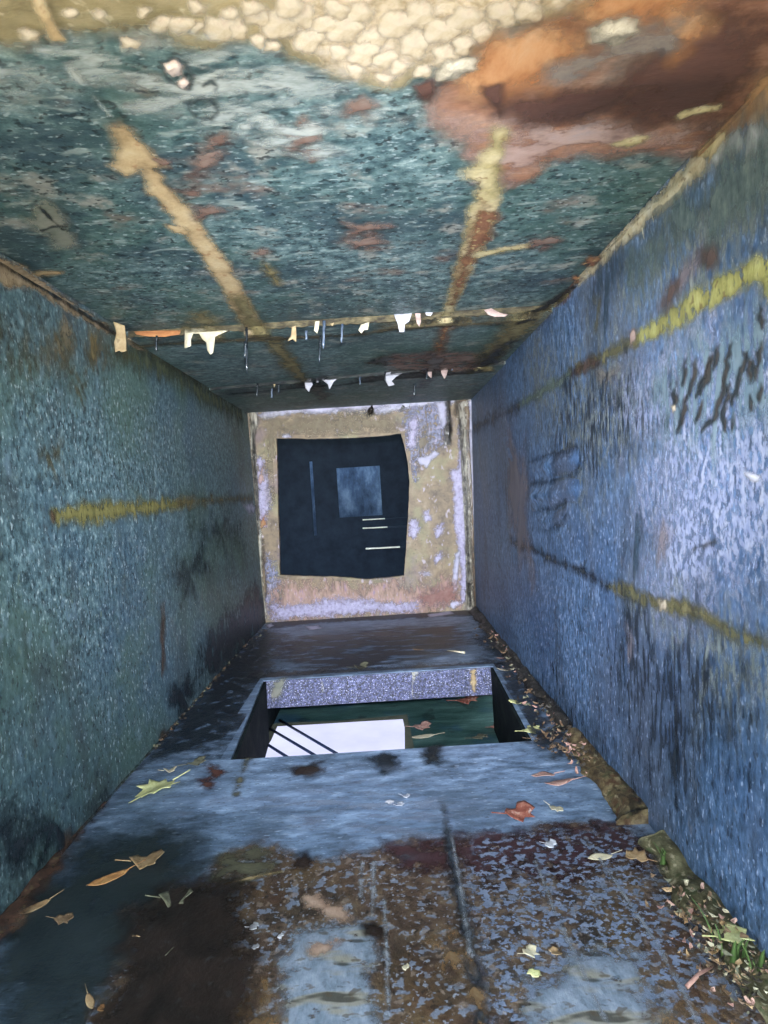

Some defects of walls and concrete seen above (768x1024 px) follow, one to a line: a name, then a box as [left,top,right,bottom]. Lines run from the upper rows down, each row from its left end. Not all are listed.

peeling [0,0,595,89]
rust [414,0,768,185]
rust [182,133,227,220]
rust [262,117,333,162]
rust [345,223,392,250]
peeling [185,328,227,355]
peeling [394,312,433,332]
peeling [305,379,337,392]
peeling [256,400,455,482]
peeling [243,457,273,528]
peeling [408,428,467,609]
damp [0,802,211,1024]